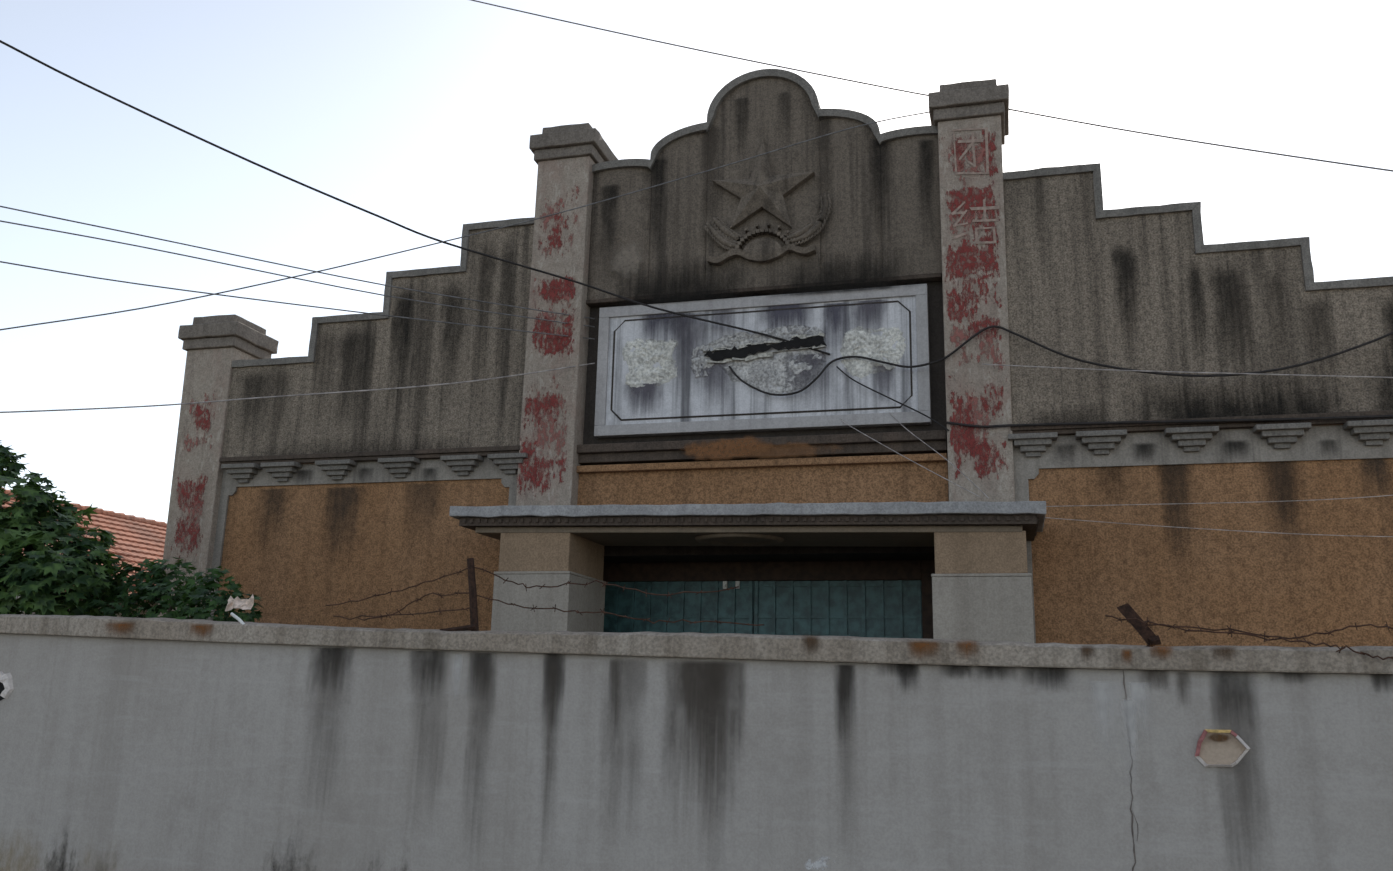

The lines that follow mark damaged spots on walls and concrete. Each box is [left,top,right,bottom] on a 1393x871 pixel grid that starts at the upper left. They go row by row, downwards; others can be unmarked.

peeling [538,185,579,256]
leakage [394,297,413,360]
peeling [531,275,578,357]
spalling [622,325,906,397]
peeling [939,130,1009,480]
peeling [517,374,567,495]
peeling [171,474,208,562]
leakage [321,648,344,674]
leakage [546,654,560,701]
leakage [678,663,734,748]
leakage [839,665,853,712]
crack [1123,671,1138,871]